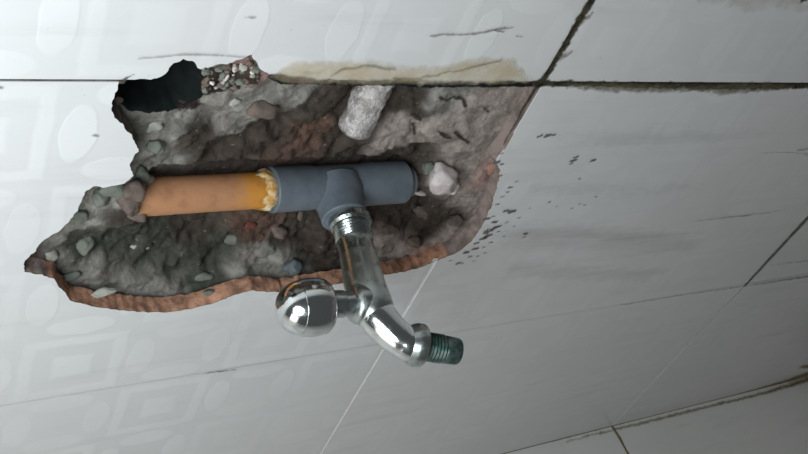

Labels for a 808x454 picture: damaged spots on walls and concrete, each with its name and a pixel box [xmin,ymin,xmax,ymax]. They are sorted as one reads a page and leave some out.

water stain [277,62,521,83]
water stain [534,0,808,94]
spalling [24,55,540,312]
water stain [612,366,808,454]